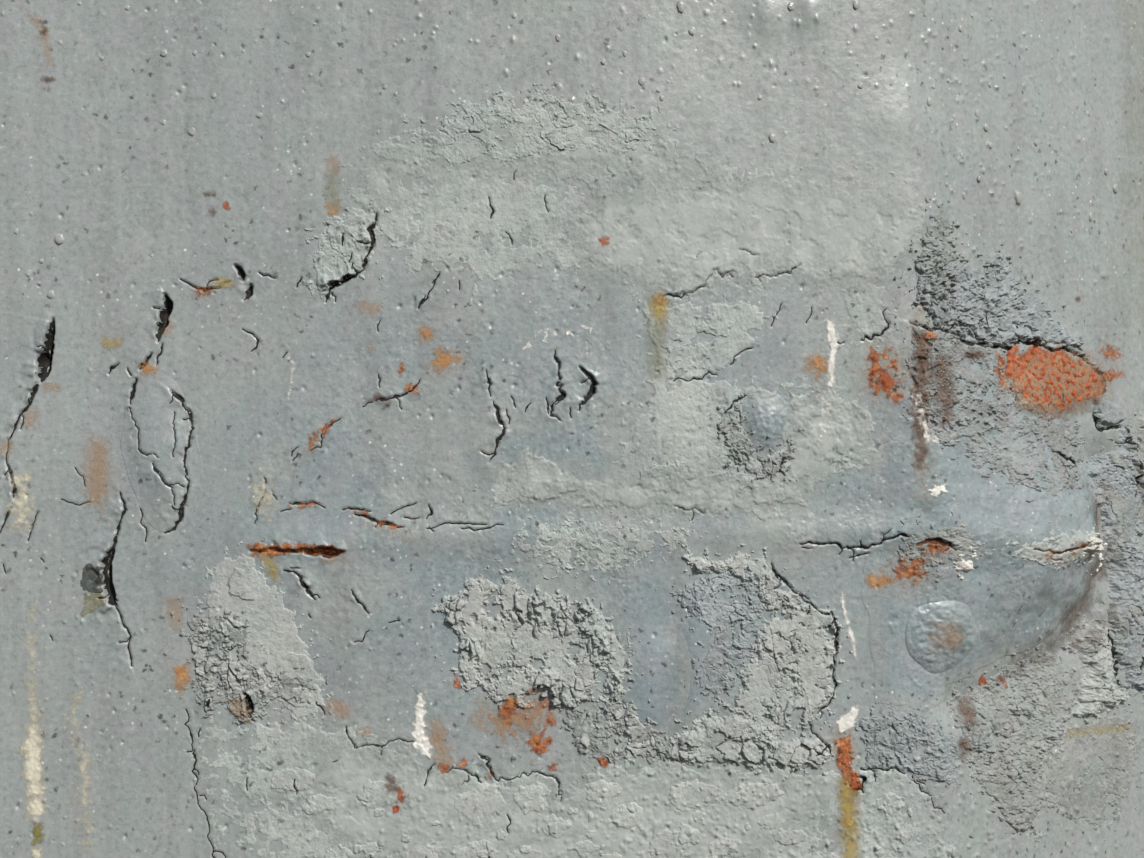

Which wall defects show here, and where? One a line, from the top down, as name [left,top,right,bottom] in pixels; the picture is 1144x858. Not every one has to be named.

crack [0,319,91,562]
crack [99,214,377,667]
crack [481,350,597,463]
peeling [166,73,1144,858]
rust [868,331,956,468]
rust [994,343,1123,415]
rust [252,543,338,580]
damp [20,685,46,858]
crack [184,699,226,858]
crack [243,693,253,720]
rust [480,689,556,755]
rust [836,734,862,858]